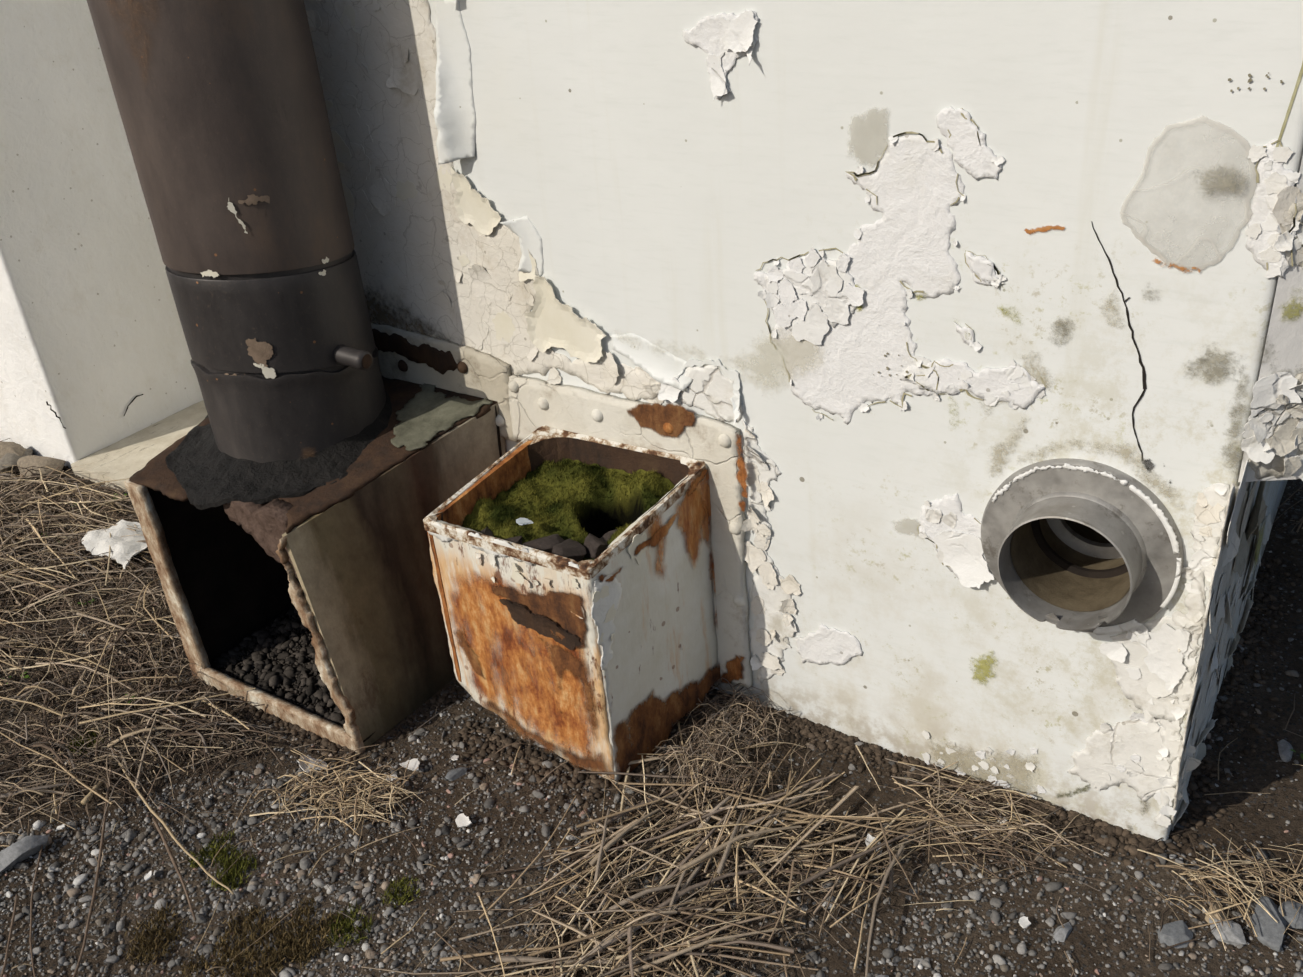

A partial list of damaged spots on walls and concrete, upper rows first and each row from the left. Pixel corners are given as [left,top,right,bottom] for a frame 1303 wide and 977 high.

damp [850,110,887,164]
peeling [754,107,1046,425]
corrosion [1025,225,1065,234]
peeling [1244,139,1303,279]
peeling [304,0,863,684]
crack [1091,221,1147,461]
corrosion [627,403,695,438]
peeling [917,493,995,589]
peeling [1067,372,1303,831]
peeling [921,730,1046,799]